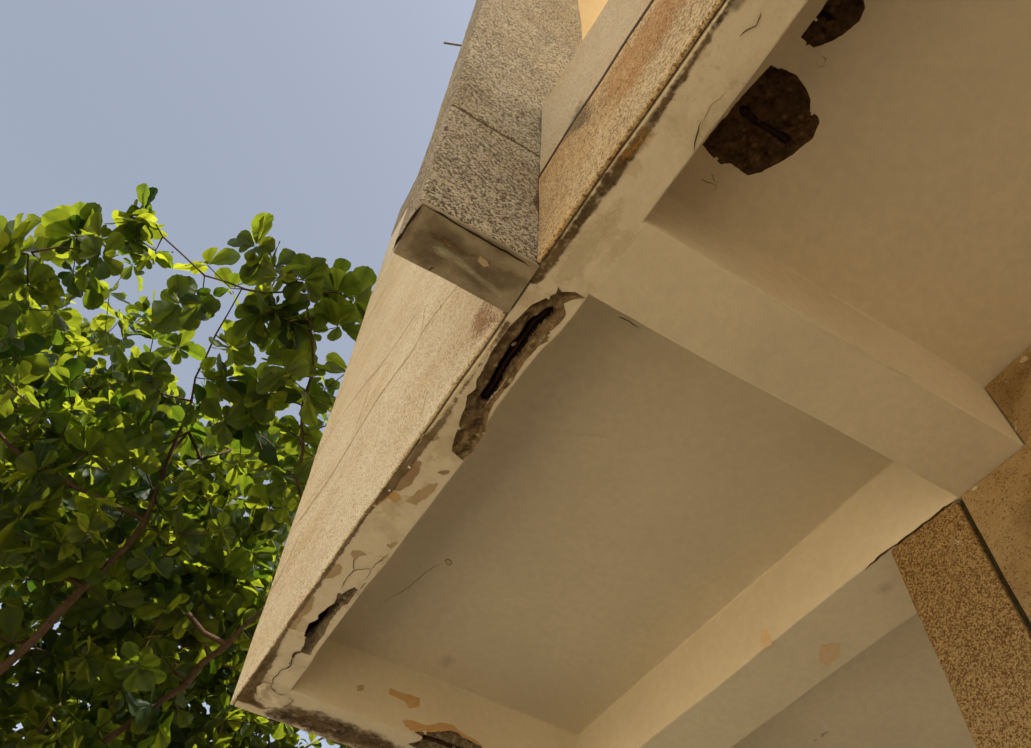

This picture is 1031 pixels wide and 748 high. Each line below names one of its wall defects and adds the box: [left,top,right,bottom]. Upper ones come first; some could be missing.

spalling [801,0,865,48]
damp [530,0,734,284]
spalling [703,65,819,175]
spalling [452,287,585,460]
crack [265,289,455,596]
damp [237,363,482,748]
spalling [286,587,358,658]
crack [255,657,293,709]
spalling [389,688,482,748]